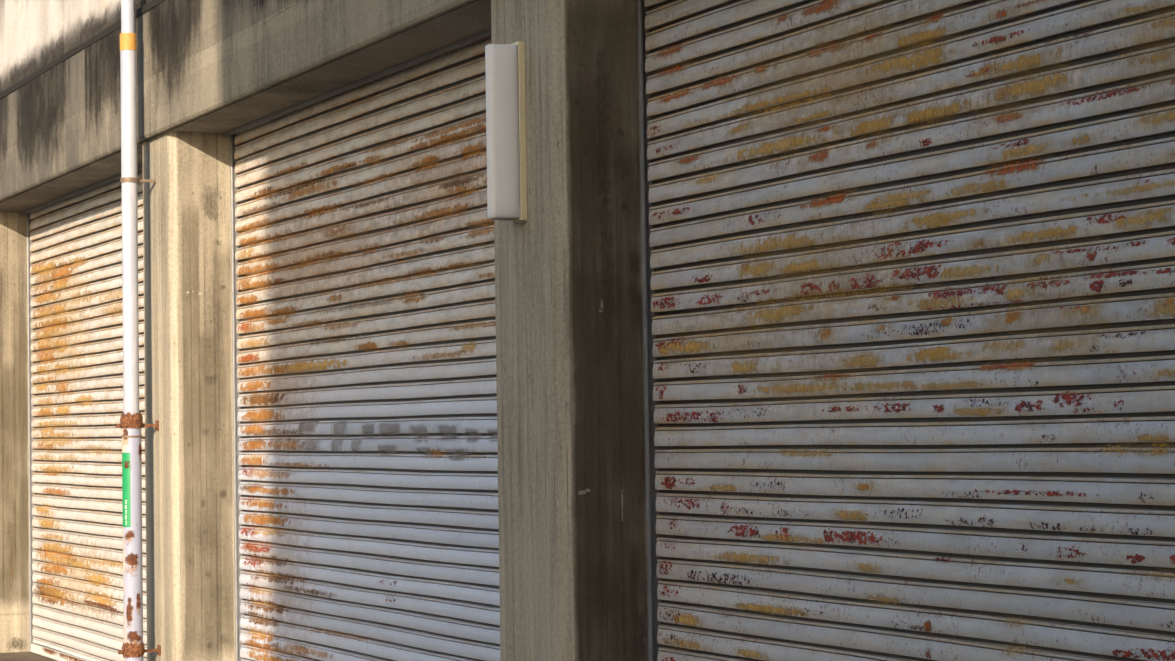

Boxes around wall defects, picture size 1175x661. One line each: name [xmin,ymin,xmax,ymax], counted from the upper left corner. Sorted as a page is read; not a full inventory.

water stain [0,6,121,147]
water stain [135,0,200,79]
rust [258,118,486,200]
peeling [799,239,1070,338]
rust [31,257,93,447]
rust [238,252,346,466]
peeling [965,391,1094,414]
rust [37,469,141,643]
rust [243,484,332,661]
peeling [823,528,897,545]
peeling [942,489,1097,500]
peeling [1112,648,1175,661]